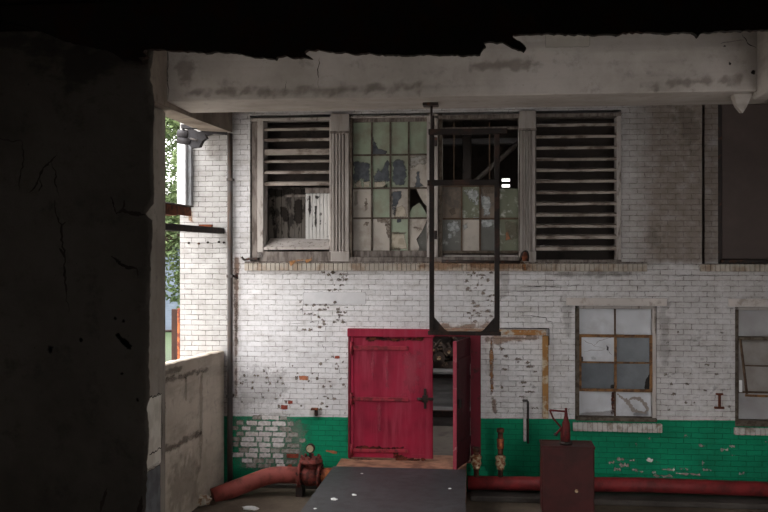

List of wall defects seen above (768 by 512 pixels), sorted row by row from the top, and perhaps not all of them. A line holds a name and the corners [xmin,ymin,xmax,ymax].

peeling [299,301,348,331]
peeling [466,271,494,322]
peeling [292,356,346,411]
corrosion [442,322,537,414]
peeling [233,369,305,468]
peeling [609,457,711,478]